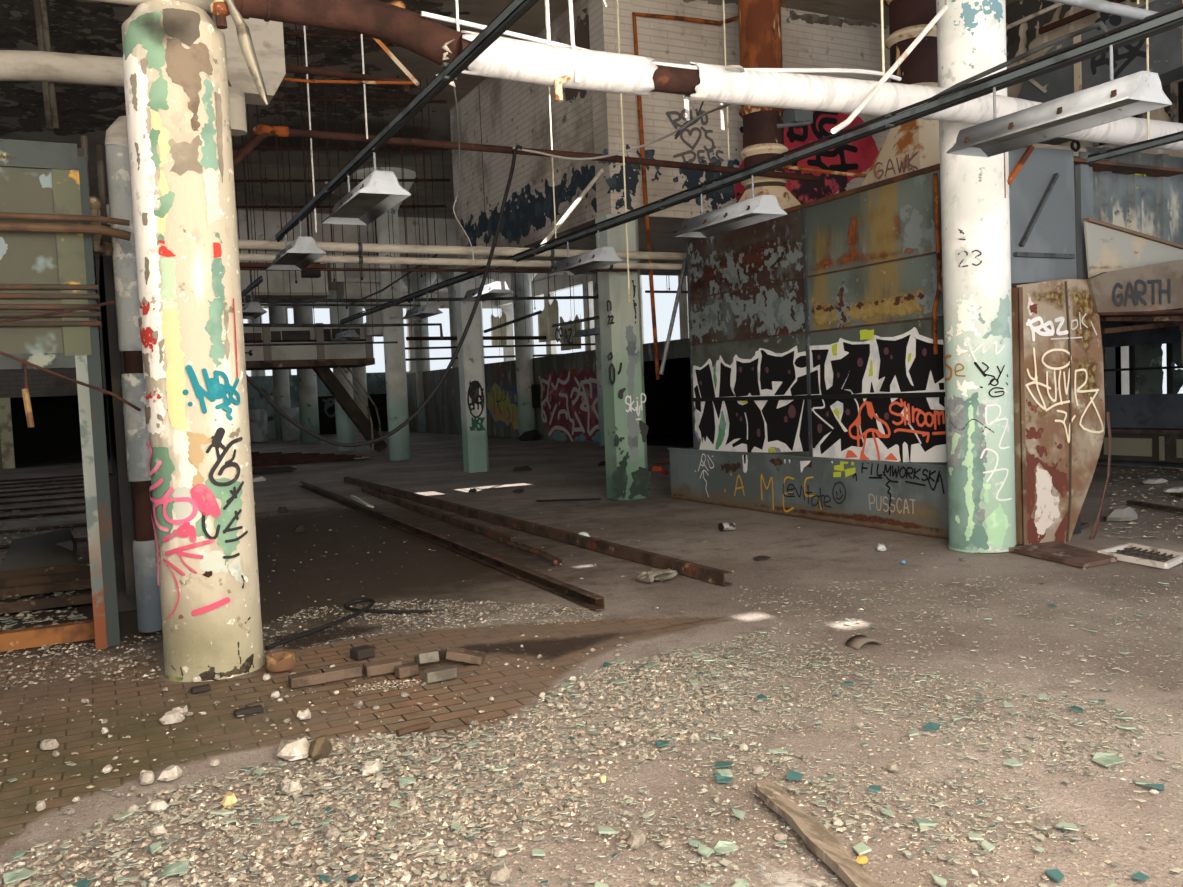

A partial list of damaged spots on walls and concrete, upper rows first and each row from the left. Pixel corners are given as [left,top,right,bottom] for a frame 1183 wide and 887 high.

peeling [254,23,436,125]
peeling [379,0,470,31]
spalling [786,10,888,30]
peeling [951,0,1072,61]
peeling [0,0,244,583]
peeling [461,143,740,248]
rust [695,243,793,287]
rust [817,218,887,268]
rust [811,281,924,328]
peeling [612,325,652,500]
peeling [947,380,1009,553]
peeling [1026,427,1069,544]